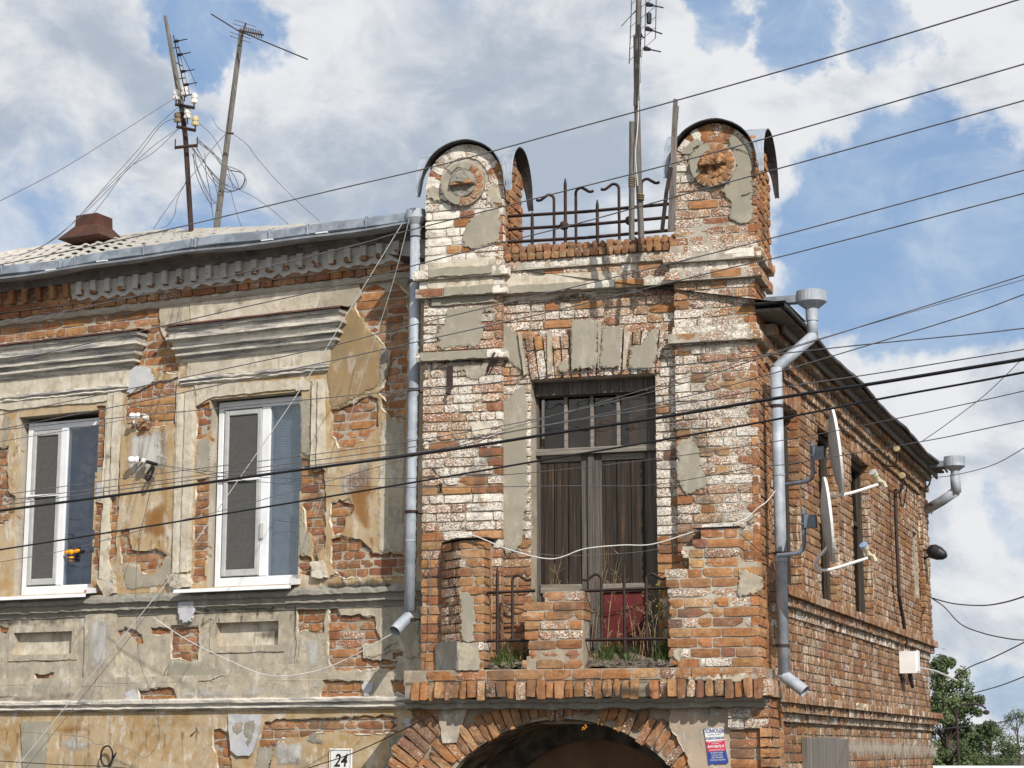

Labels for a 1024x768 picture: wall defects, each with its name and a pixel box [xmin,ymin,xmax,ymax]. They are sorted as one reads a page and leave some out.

spalling [0,308,179,437]
spalling [331,282,410,449]
spalling [195,403,215,442]
spalling [0,445,24,526]
spalling [84,466,167,595]
spalling [192,477,212,584]
spalling [300,458,405,580]
spalling [124,687,177,699]
spalling [117,625,200,661]
spalling [296,609,405,697]
spalling [256,714,398,768]